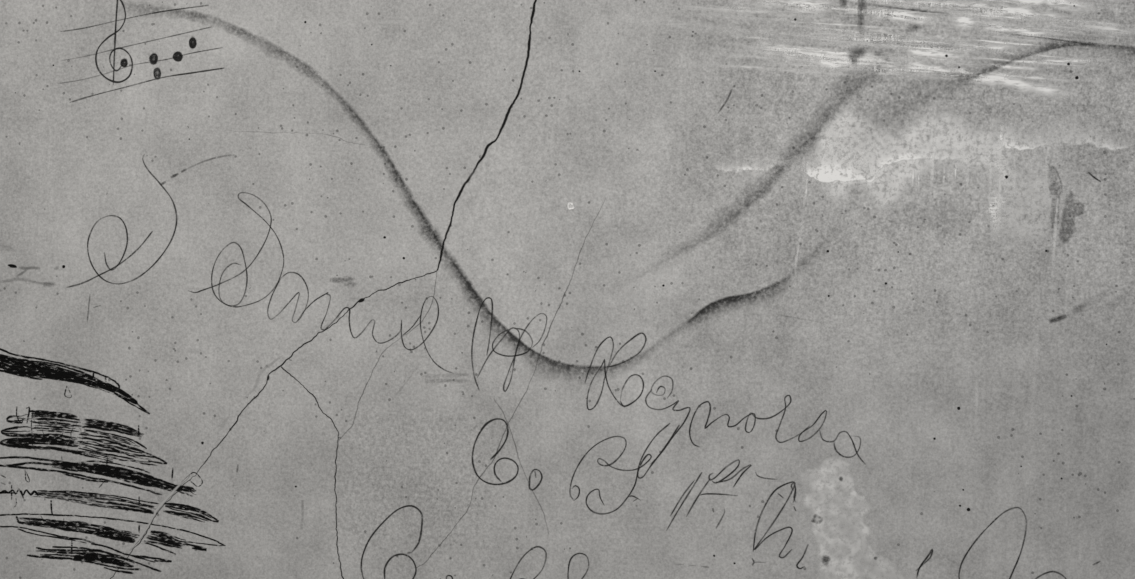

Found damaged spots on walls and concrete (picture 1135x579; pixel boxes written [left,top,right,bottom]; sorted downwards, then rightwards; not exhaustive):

crack [110,0,537,579]